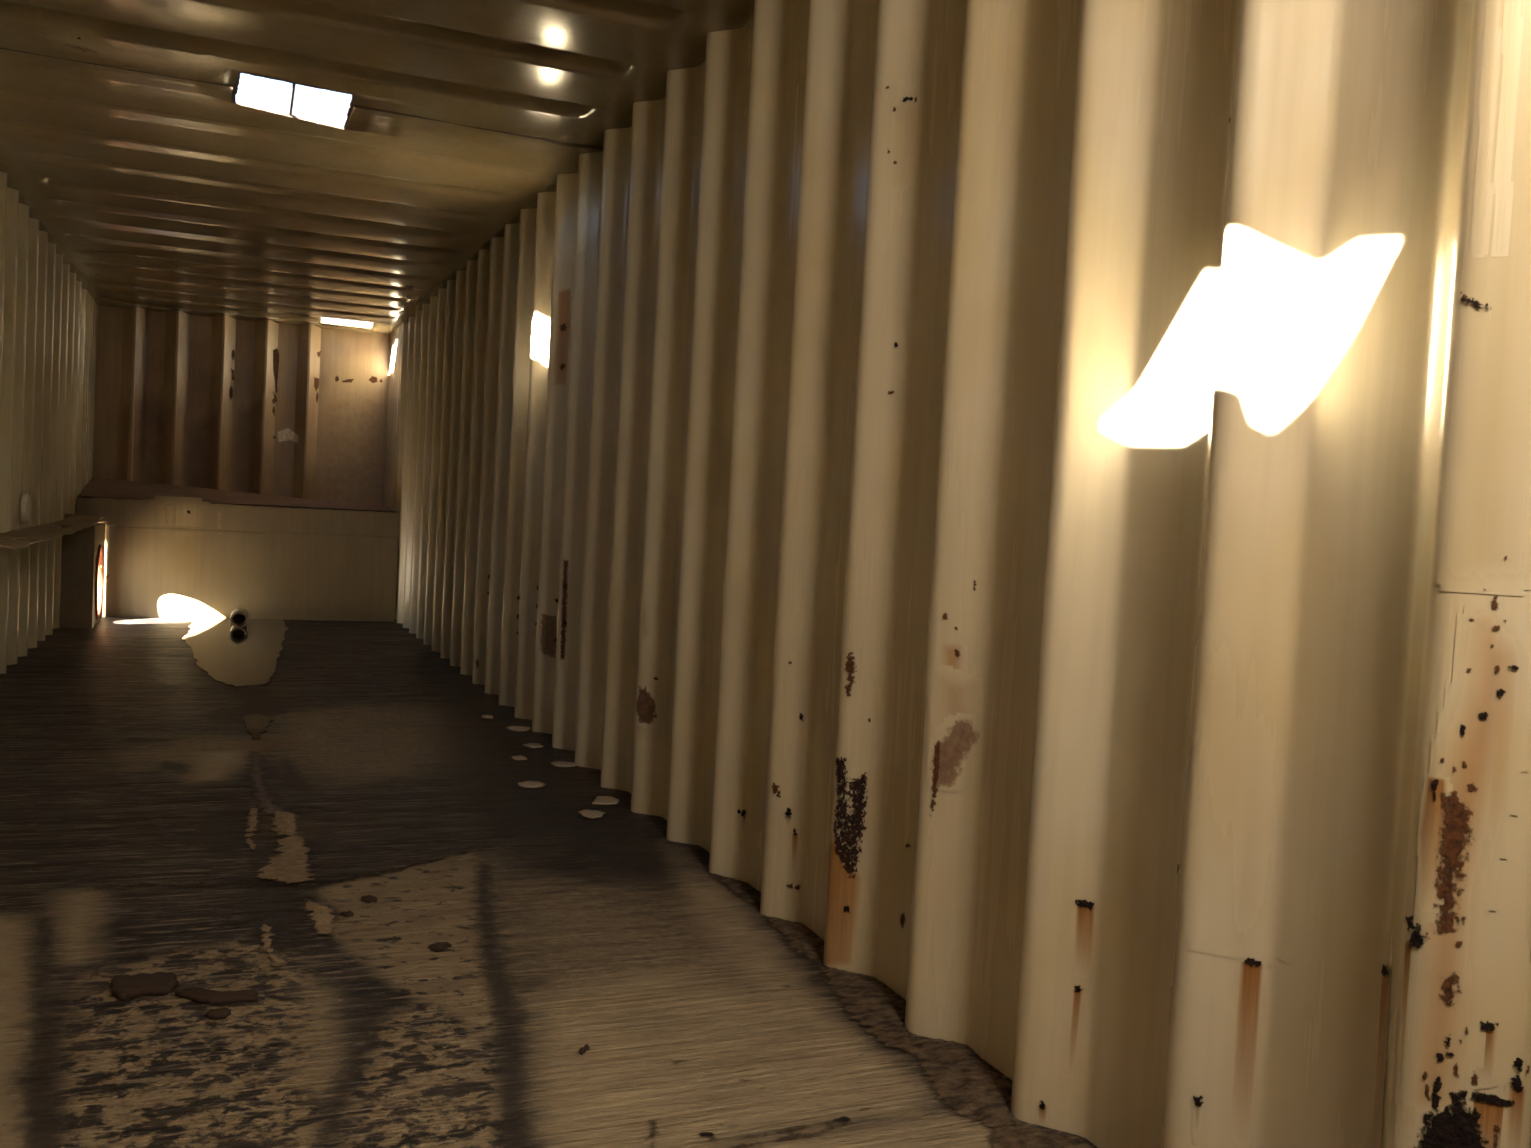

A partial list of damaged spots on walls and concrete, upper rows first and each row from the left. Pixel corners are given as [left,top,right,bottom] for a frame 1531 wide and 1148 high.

rust [633,669,670,751]
rust [845,652,857,697]
rust [926,612,987,817]
rust [823,757,869,972]
rust [1179,618,1317,1148]
rust [1367,589,1531,1148]
rust [1063,899,1097,1089]